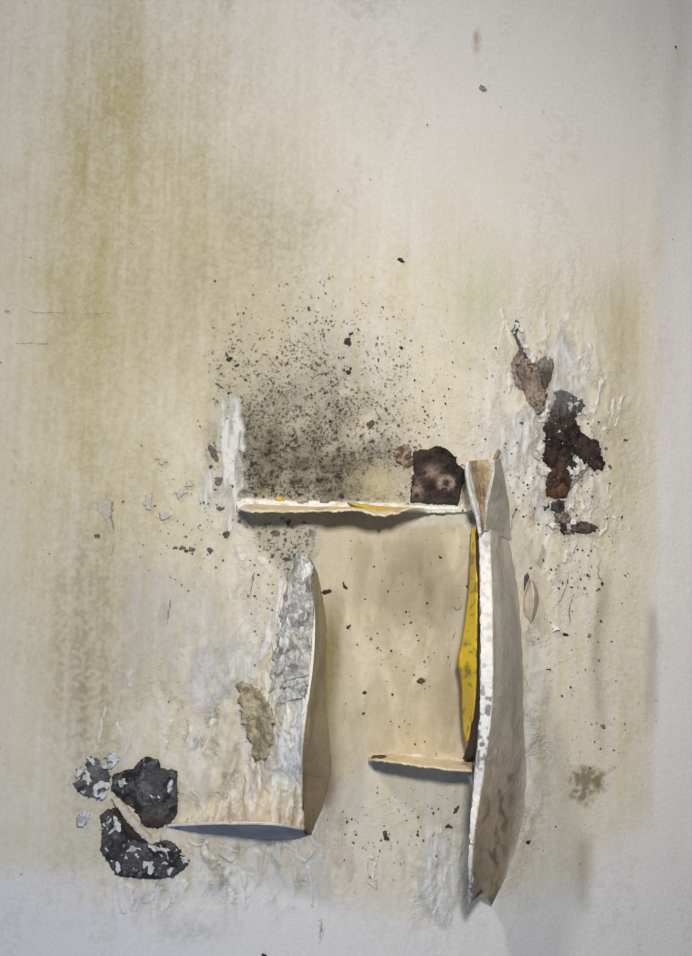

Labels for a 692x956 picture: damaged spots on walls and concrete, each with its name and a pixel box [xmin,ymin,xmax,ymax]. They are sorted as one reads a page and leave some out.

water stain [103,48,142,181]
water stain [217,297,430,502]
water stain [238,520,311,577]
peeling [72,552,331,879]
peeling [236,444,527,905]